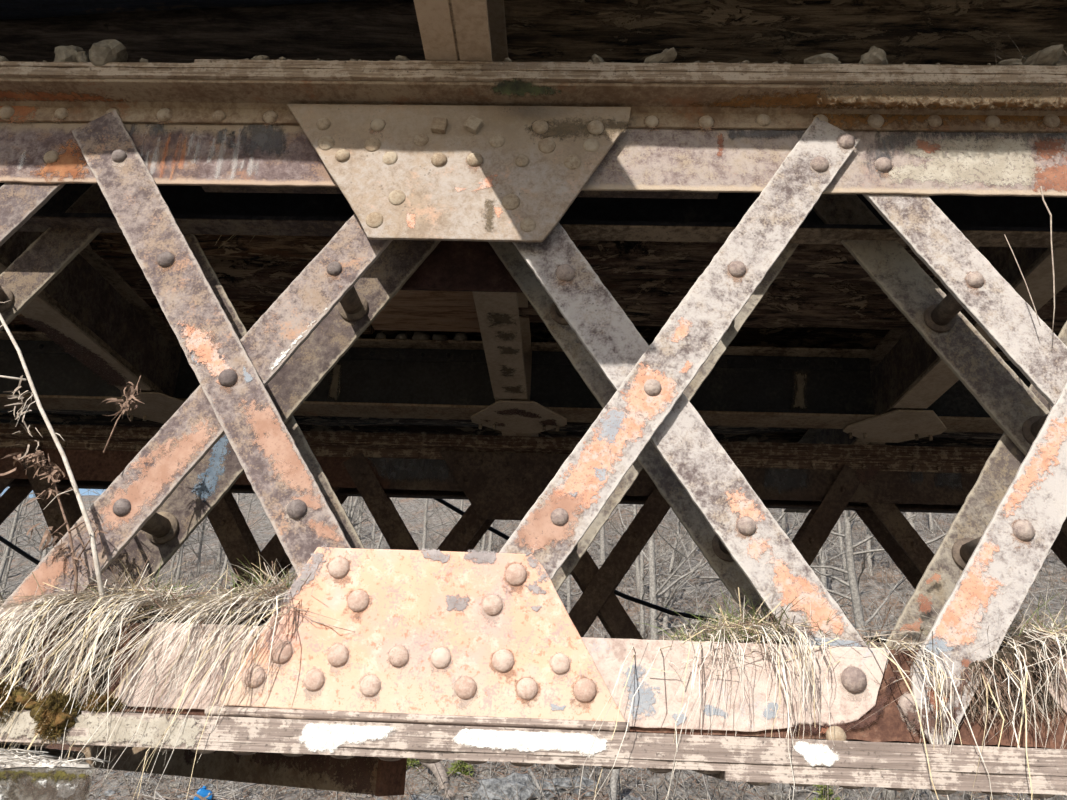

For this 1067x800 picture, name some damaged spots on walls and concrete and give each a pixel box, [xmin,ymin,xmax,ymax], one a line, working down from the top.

corrosion [0,90,128,102]
corrosion [30,140,88,181]
corrosion [691,88,1067,192]
peeling [623,665,660,719]